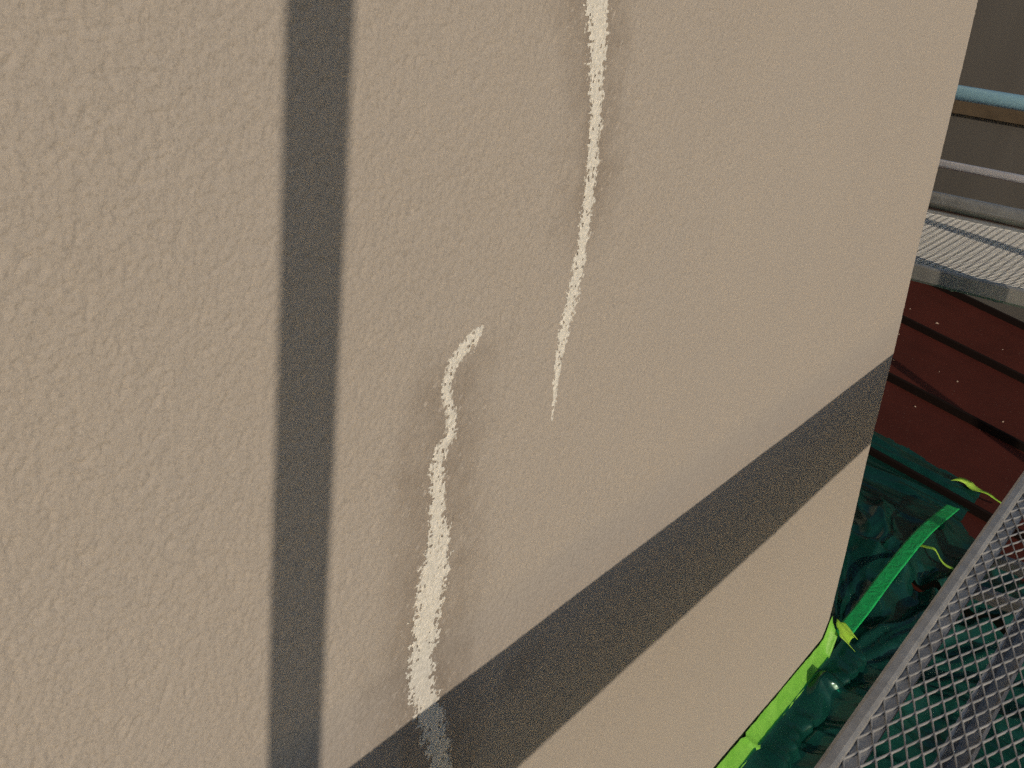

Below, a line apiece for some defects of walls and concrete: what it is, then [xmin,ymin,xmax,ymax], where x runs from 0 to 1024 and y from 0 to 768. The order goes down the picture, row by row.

crack [551,0,612,421]
crack [404,325,485,768]